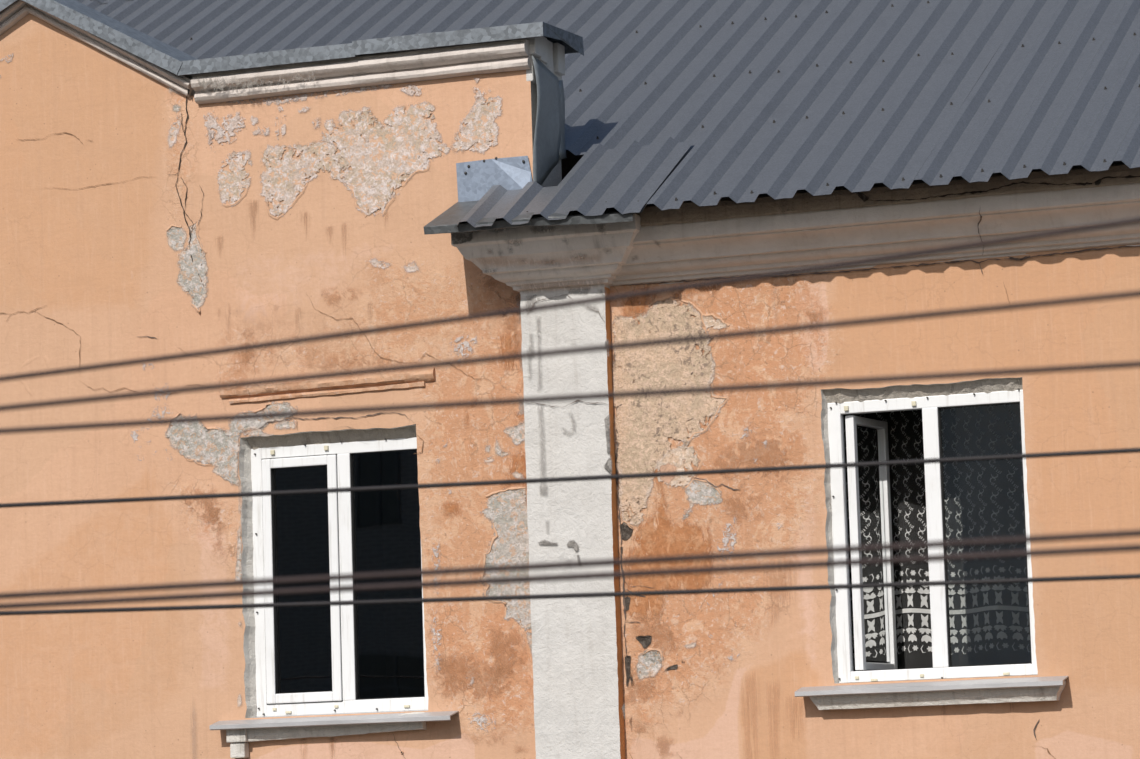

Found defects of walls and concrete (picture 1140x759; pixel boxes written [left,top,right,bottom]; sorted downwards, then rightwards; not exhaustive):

crack [173,78,204,294]
peeling [203,78,502,220]
spalling [164,400,297,510]
spalling [485,420,525,462]
spalling [604,296,730,552]
spalling [481,472,580,653]
water stain [718,519,736,553]
spalling [625,636,678,686]